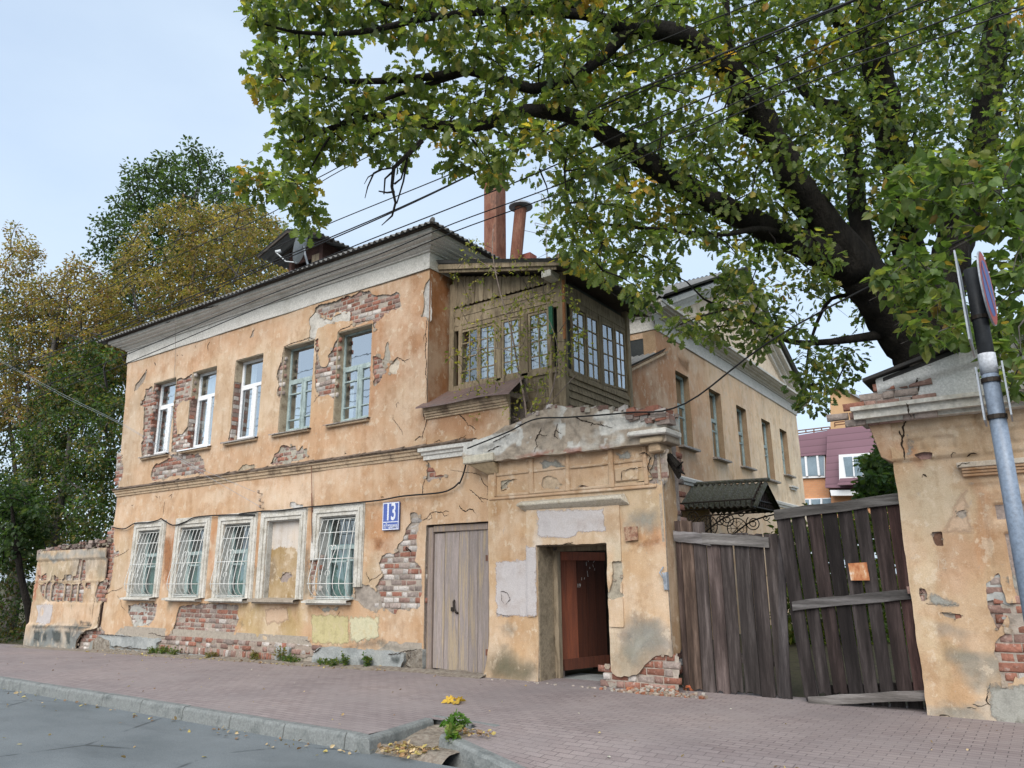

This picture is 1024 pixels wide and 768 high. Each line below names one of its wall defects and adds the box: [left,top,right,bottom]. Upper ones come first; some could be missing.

flaking render [309,291,402,399]
flaking render [135,371,206,481]
flaking render [272,444,309,465]
crack [535,417,611,447]
spalling [826,361,938,428]
crack [899,378,927,477]
flaking render [37,525,119,603]
flaking render [351,512,428,614]
flaking render [129,602,157,627]
flaking render [158,603,322,660]
flaking render [986,573,1024,688]
flaking render [598,654,682,690]